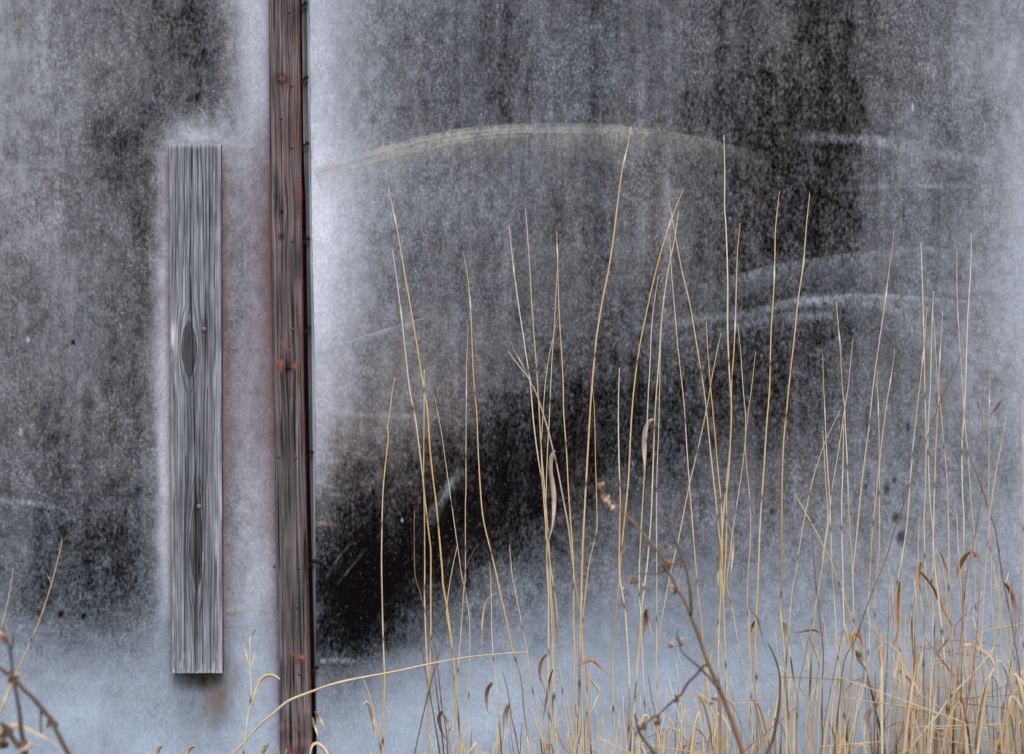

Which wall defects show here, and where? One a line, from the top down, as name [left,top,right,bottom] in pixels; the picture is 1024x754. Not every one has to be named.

damp [162,0,207,101]
damp [316,0,871,660]
damp [36,488,140,612]